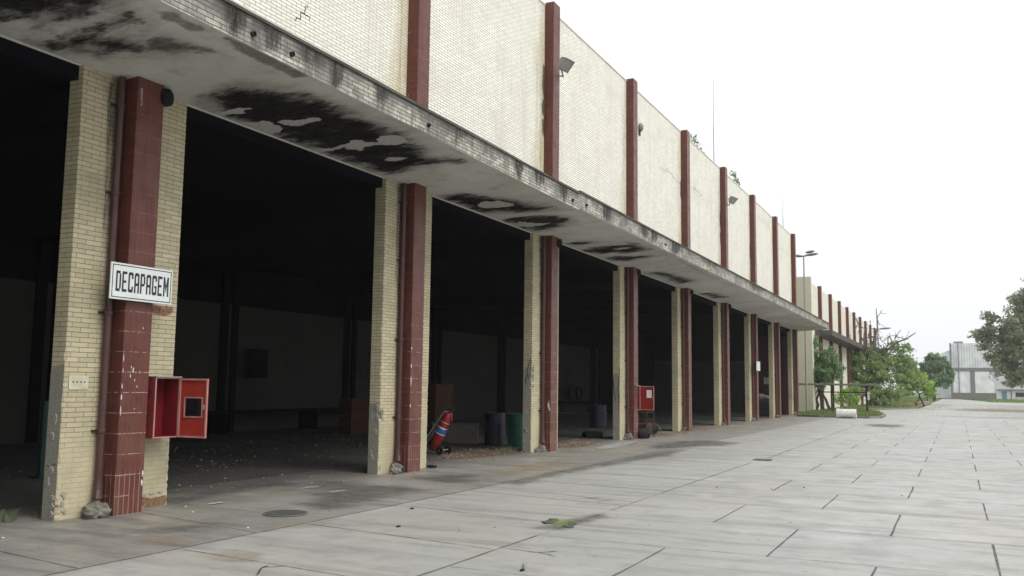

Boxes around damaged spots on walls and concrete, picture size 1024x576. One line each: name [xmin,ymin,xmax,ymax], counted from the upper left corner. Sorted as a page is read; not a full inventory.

damp [0,0,193,52]
damp [211,88,464,186]
damp [446,194,568,231]
damp [569,242,644,275]